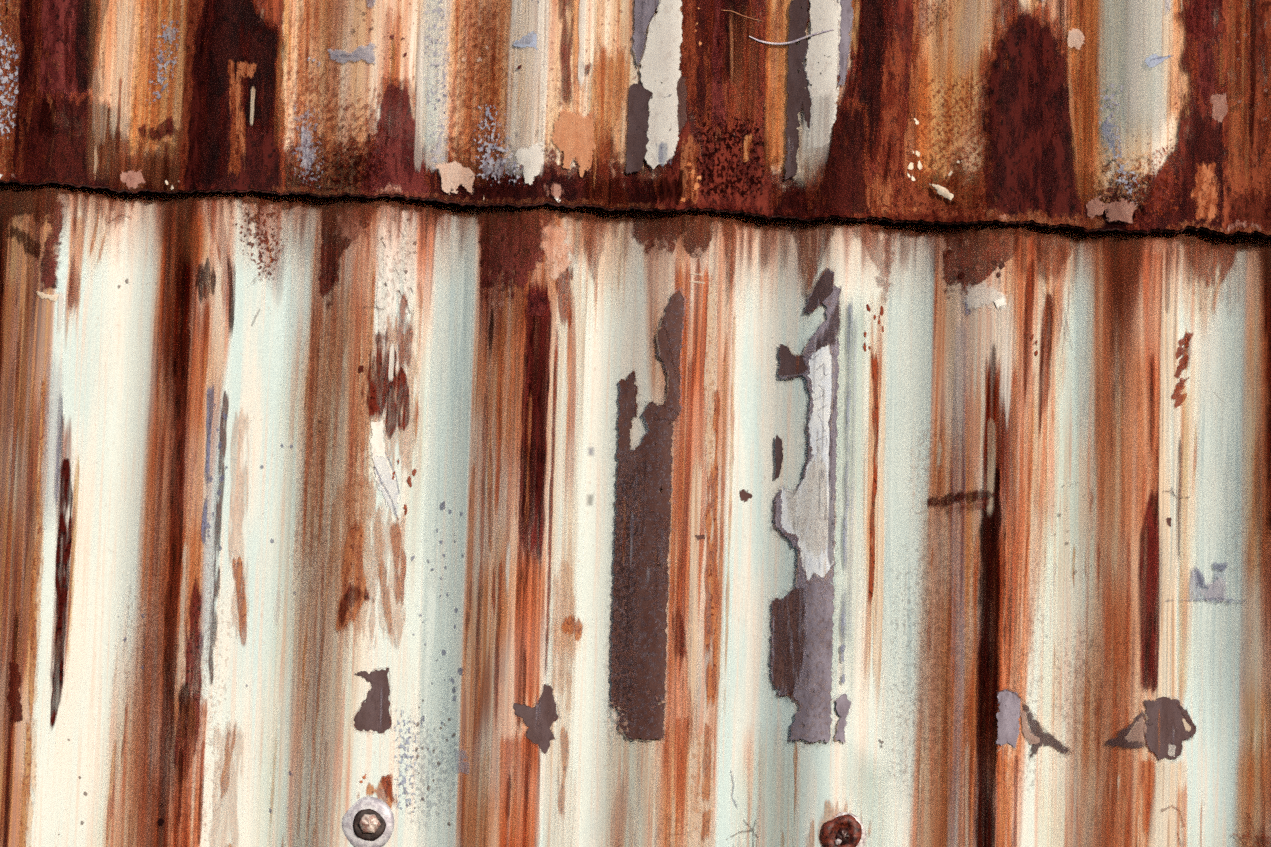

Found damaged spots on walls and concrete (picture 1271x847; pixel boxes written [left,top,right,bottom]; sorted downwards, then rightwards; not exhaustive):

peeling [626,0,687,174]
peeling [785,0,853,179]
corrosion [0,0,1271,551]
corrosion [7,662,23,723]
corrosion [51,459,73,726]
peeling [354,668,423,812]
peeling [611,291,684,740]
peeling [771,268,853,743]
corrosion [863,332,885,682]
corrosion [978,340,1010,847]
peeling [1106,697,1196,760]
corrosion [1140,248,1194,700]